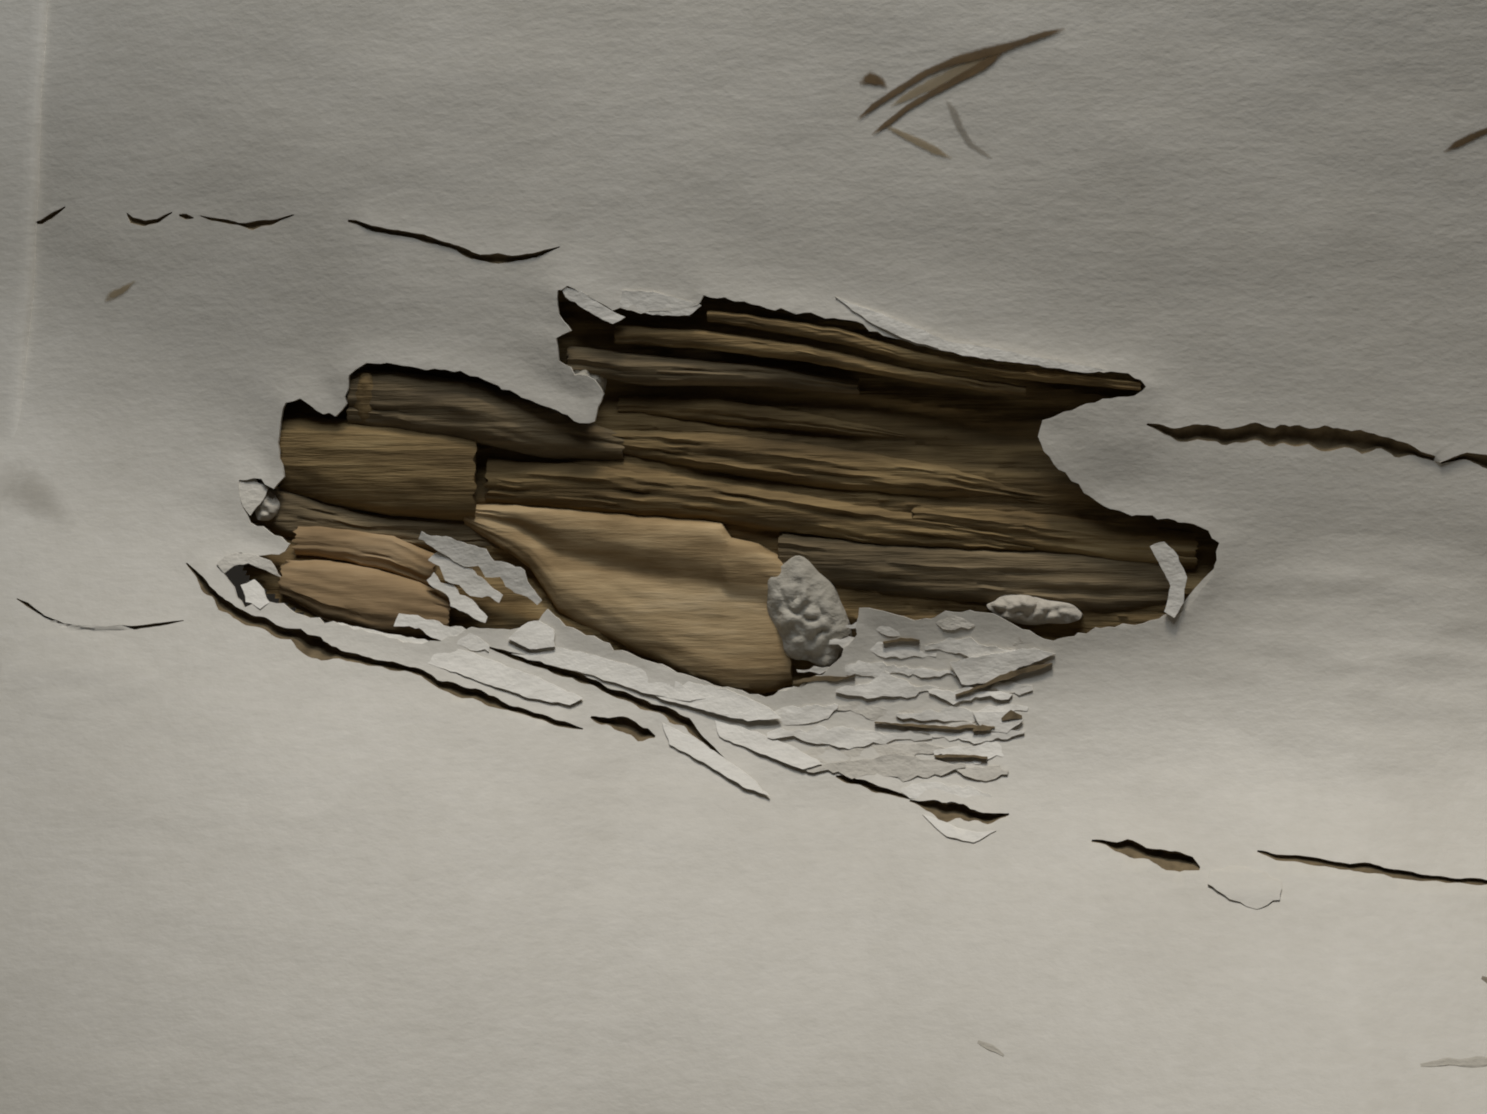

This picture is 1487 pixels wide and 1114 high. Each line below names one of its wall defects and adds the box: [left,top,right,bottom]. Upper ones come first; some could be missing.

crack [37,207,65,224]
crack [127,212,294,230]
crack [348,220,560,264]
crack [1147,422,1487,469]
spalling [217,286,1219,804]
crack [17,599,55,620]
crack [1092,839,1487,909]